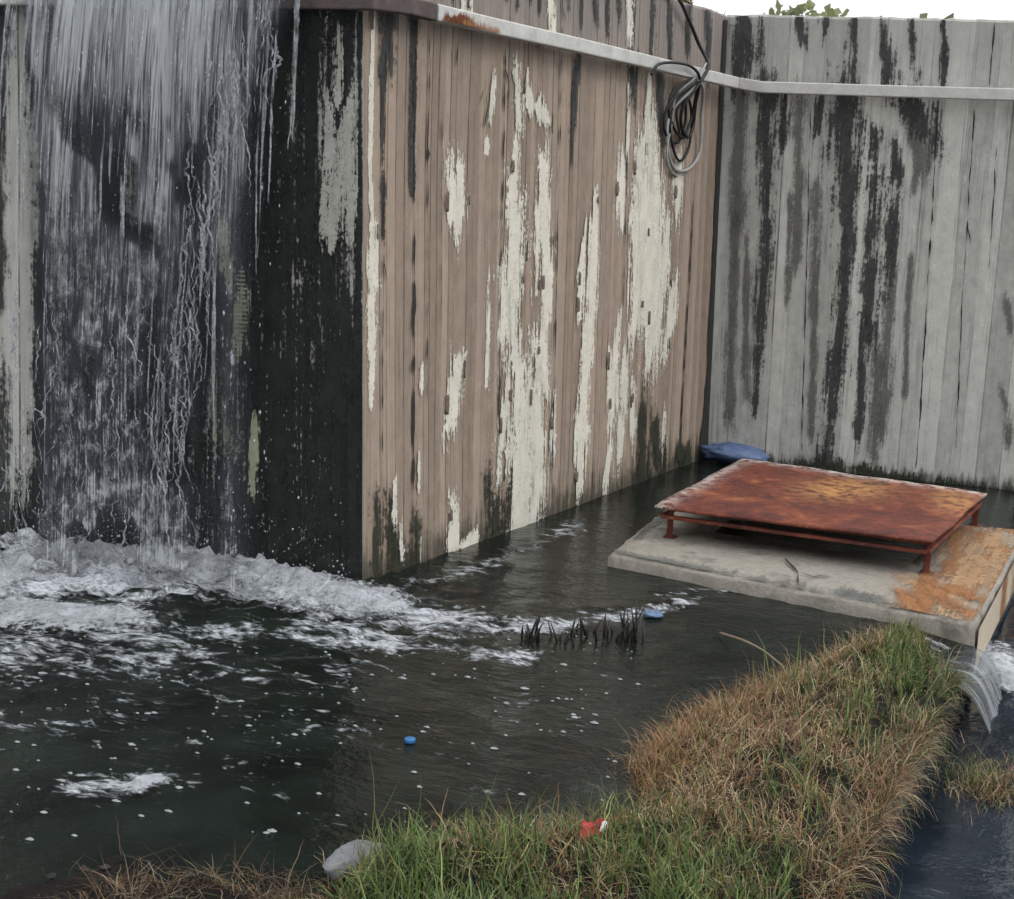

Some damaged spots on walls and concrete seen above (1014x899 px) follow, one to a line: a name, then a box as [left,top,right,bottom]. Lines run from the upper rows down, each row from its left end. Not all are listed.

peeling [625,0,635,50]
water stain [938,20,950,86]
water stain [0,6,363,581]
peeling [318,11,385,412]
peeling [442,133,471,253]
peeling [484,53,557,532]
peeling [571,65,688,506]
water stain [723,16,948,481]
peeling [441,336,468,456]
peeling [444,485,480,552]
corrosion [890,525,1014,621]
water stain [936,476,986,487]